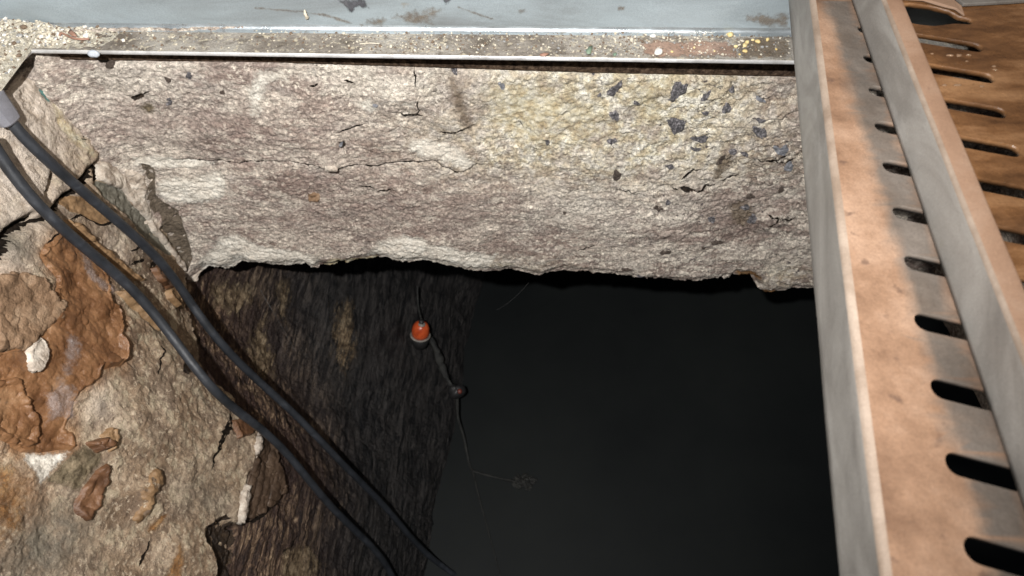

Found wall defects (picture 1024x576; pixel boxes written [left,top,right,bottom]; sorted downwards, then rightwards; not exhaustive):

crack [400,67,469,134]
spalling [597,80,623,97]
spalling [668,81,688,102]
spalling [722,85,735,114]
spalling [667,117,709,152]
spalling [715,149,748,165]
spalling [752,118,794,171]
crack [171,158,477,192]
spalling [64,160,201,331]
peeling [85,427,120,453]
crack [212,412,232,468]
peeling [205,418,288,576]